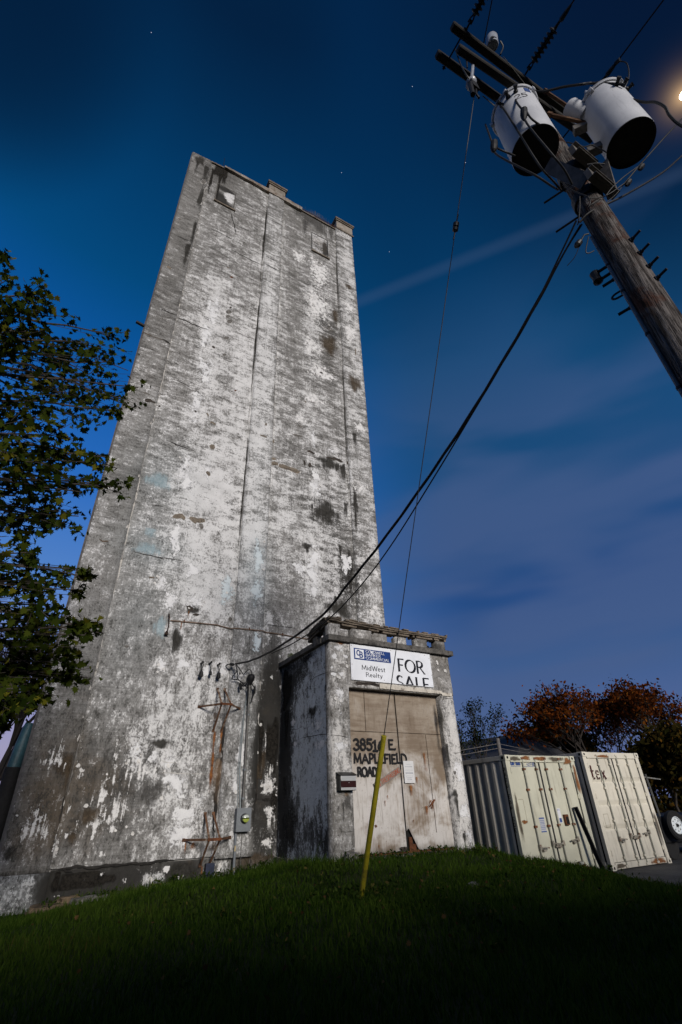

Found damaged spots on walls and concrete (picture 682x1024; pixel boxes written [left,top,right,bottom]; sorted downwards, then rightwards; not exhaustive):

leakage [183,222,197,263]
leakage [196,157,228,206]
crack [57,189,284,832]
leakage [311,369,361,528]
peeling [16,736,205,868]
rust [209,732,223,784]
peeling [260,760,278,849]
leakage [255,670,298,845]